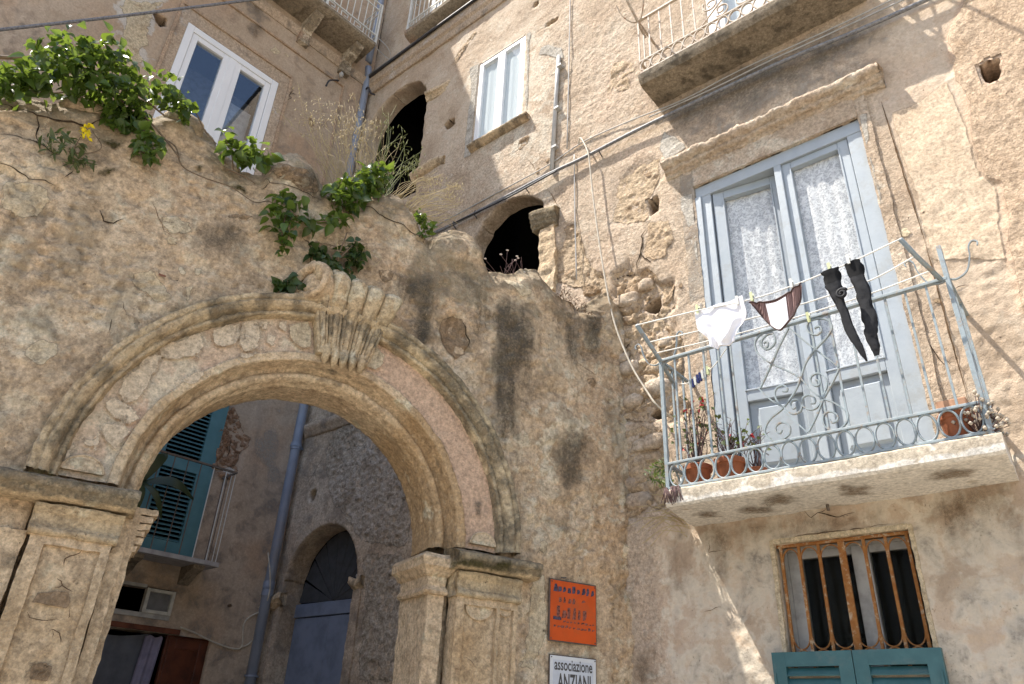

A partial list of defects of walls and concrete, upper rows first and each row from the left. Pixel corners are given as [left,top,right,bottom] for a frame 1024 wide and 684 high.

damp [566,316,601,354]
damp [494,302,532,423]
damp [932,470,971,479]
damp [744,495,791,513]
crack [795,509,885,537]